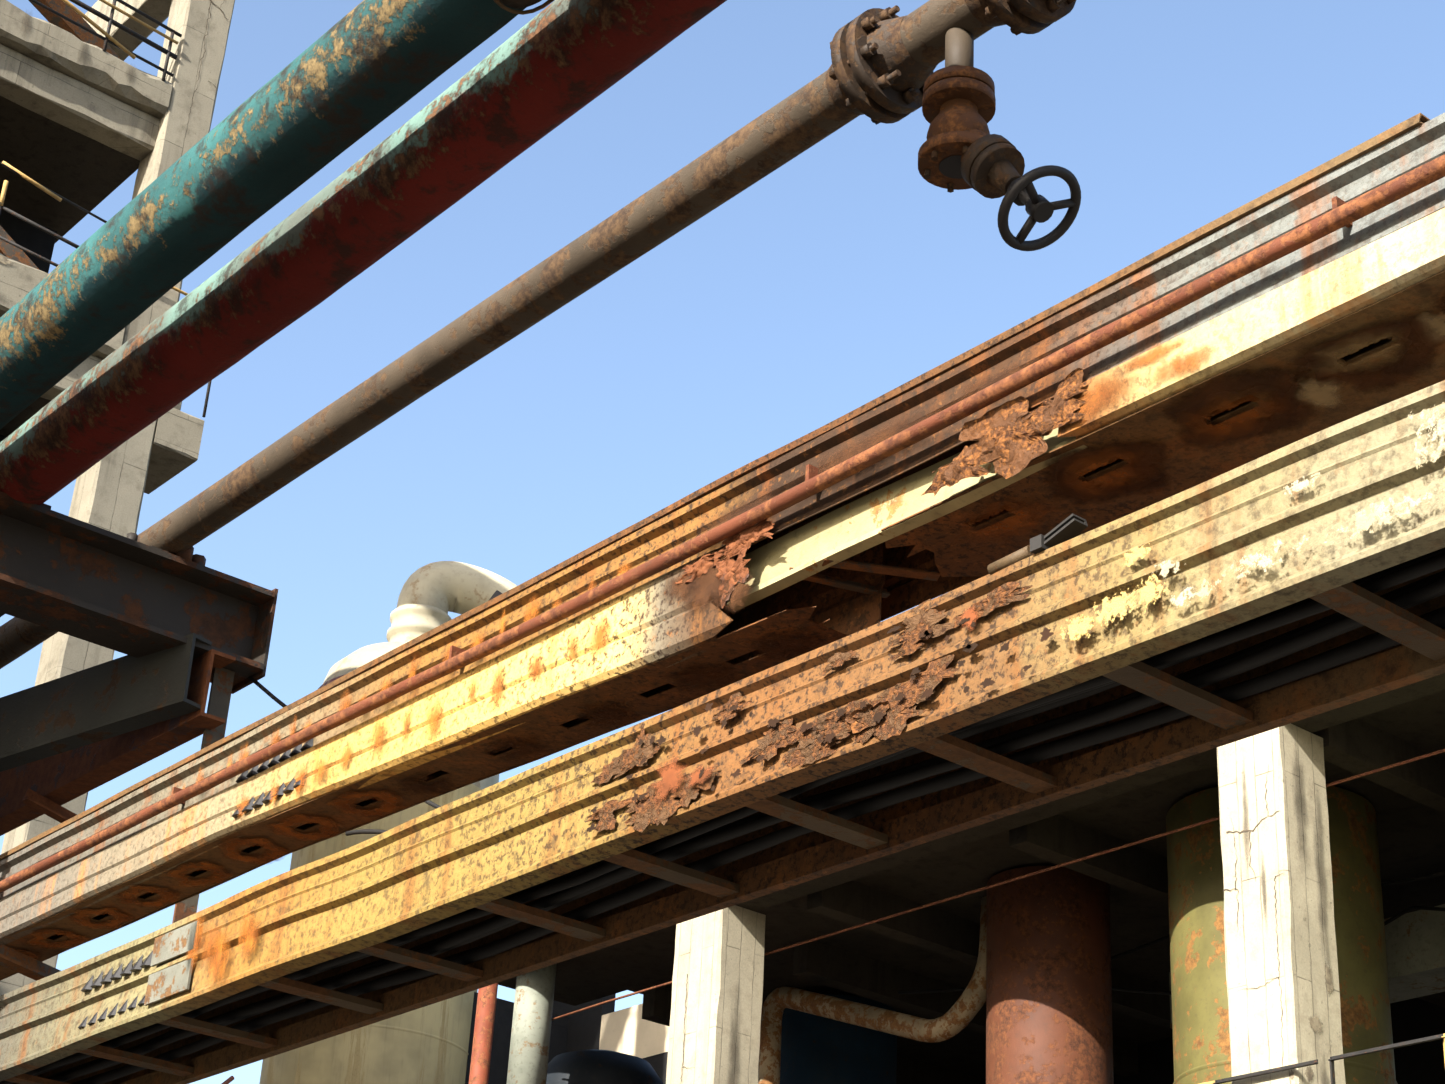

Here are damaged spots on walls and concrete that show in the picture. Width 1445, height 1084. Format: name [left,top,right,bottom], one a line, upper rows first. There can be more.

rust [818,359,1037,474]
rust [1075,342,1208,414]
rust [1164,298,1445,447]
peeling [1302,382,1337,405]
peeling [1328,334,1393,368]
rust [703,491,772,533]
peeling [1060,402,1445,641]
rust [663,553,748,608]
rust [760,634,819,660]
rust [919,607,978,668]
rust [963,678,996,694]
rust [626,668,753,803]